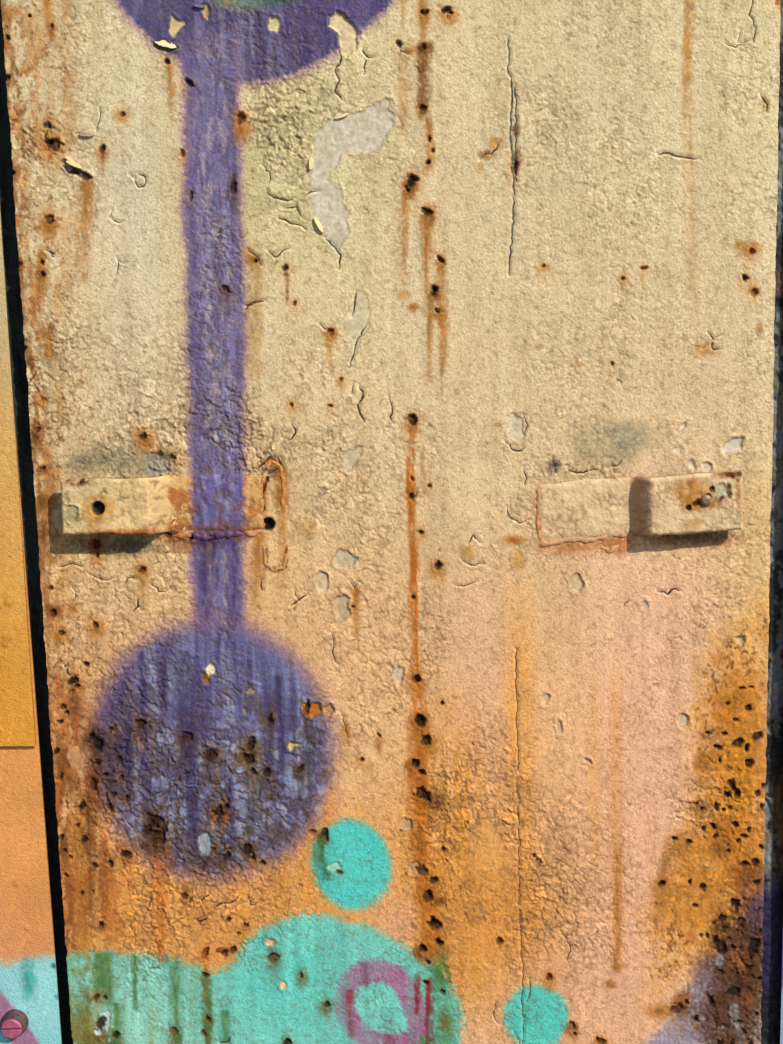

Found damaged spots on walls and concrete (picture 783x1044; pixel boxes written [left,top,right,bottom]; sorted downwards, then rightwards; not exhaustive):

peeling [309,98,394,255]
corrosion [396,0,434,166]
crack [507,39,518,276]
corrosion [399,207,446,374]
peeling [315,549,358,622]
corrosion [663,471,742,547]
peeling [202,663,216,683]
peeling [303,701,335,717]
corrosion [404,414,449,993]
corrosion [54,686,129,945]
peeling [198,832,212,855]
corrosion [650,672,765,1044]